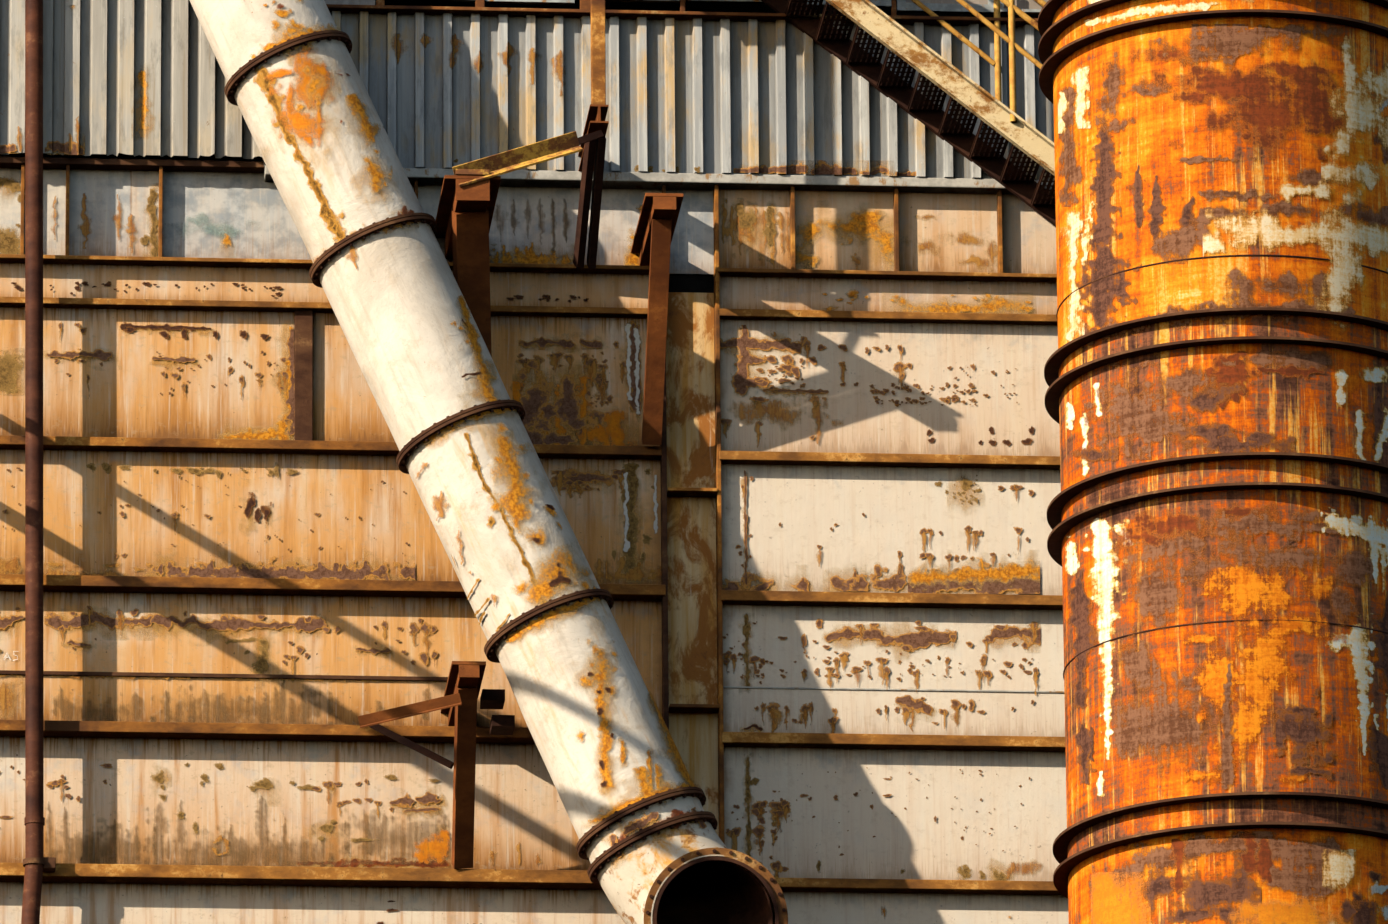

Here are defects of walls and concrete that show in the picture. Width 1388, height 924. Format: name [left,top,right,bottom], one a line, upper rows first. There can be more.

rust [251,0,393,193]
rust [1058,24,1388,348]
rust [120,322,294,440]
rust [422,295,654,642]
rust [720,325,1017,448]
rust [1072,351,1332,462]
rust [44,606,393,682]
rust [249,777,450,868]
rust [577,639,707,858]
rust [723,614,1041,733]
rust [1067,570,1099,785]
rust [1114,500,1388,790]